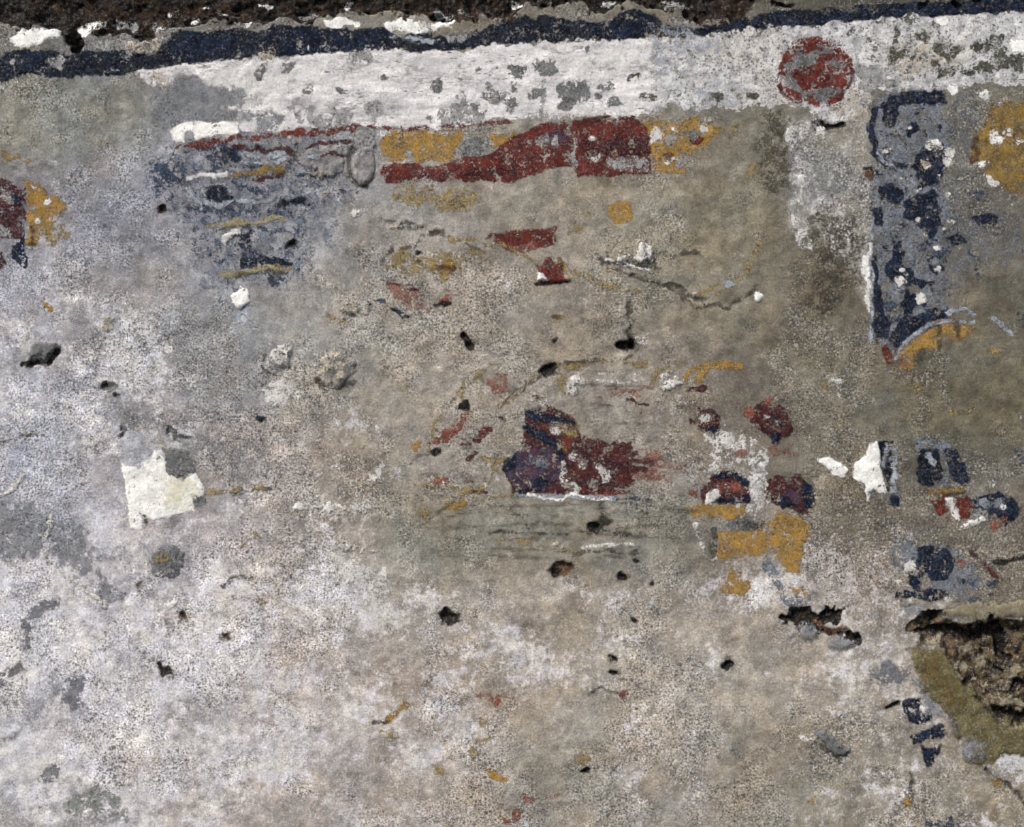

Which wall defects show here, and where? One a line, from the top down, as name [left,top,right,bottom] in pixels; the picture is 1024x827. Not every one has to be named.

spalling [0,0,755,75]
flaking render [779,605,862,649]
flaking render [905,609,1024,727]